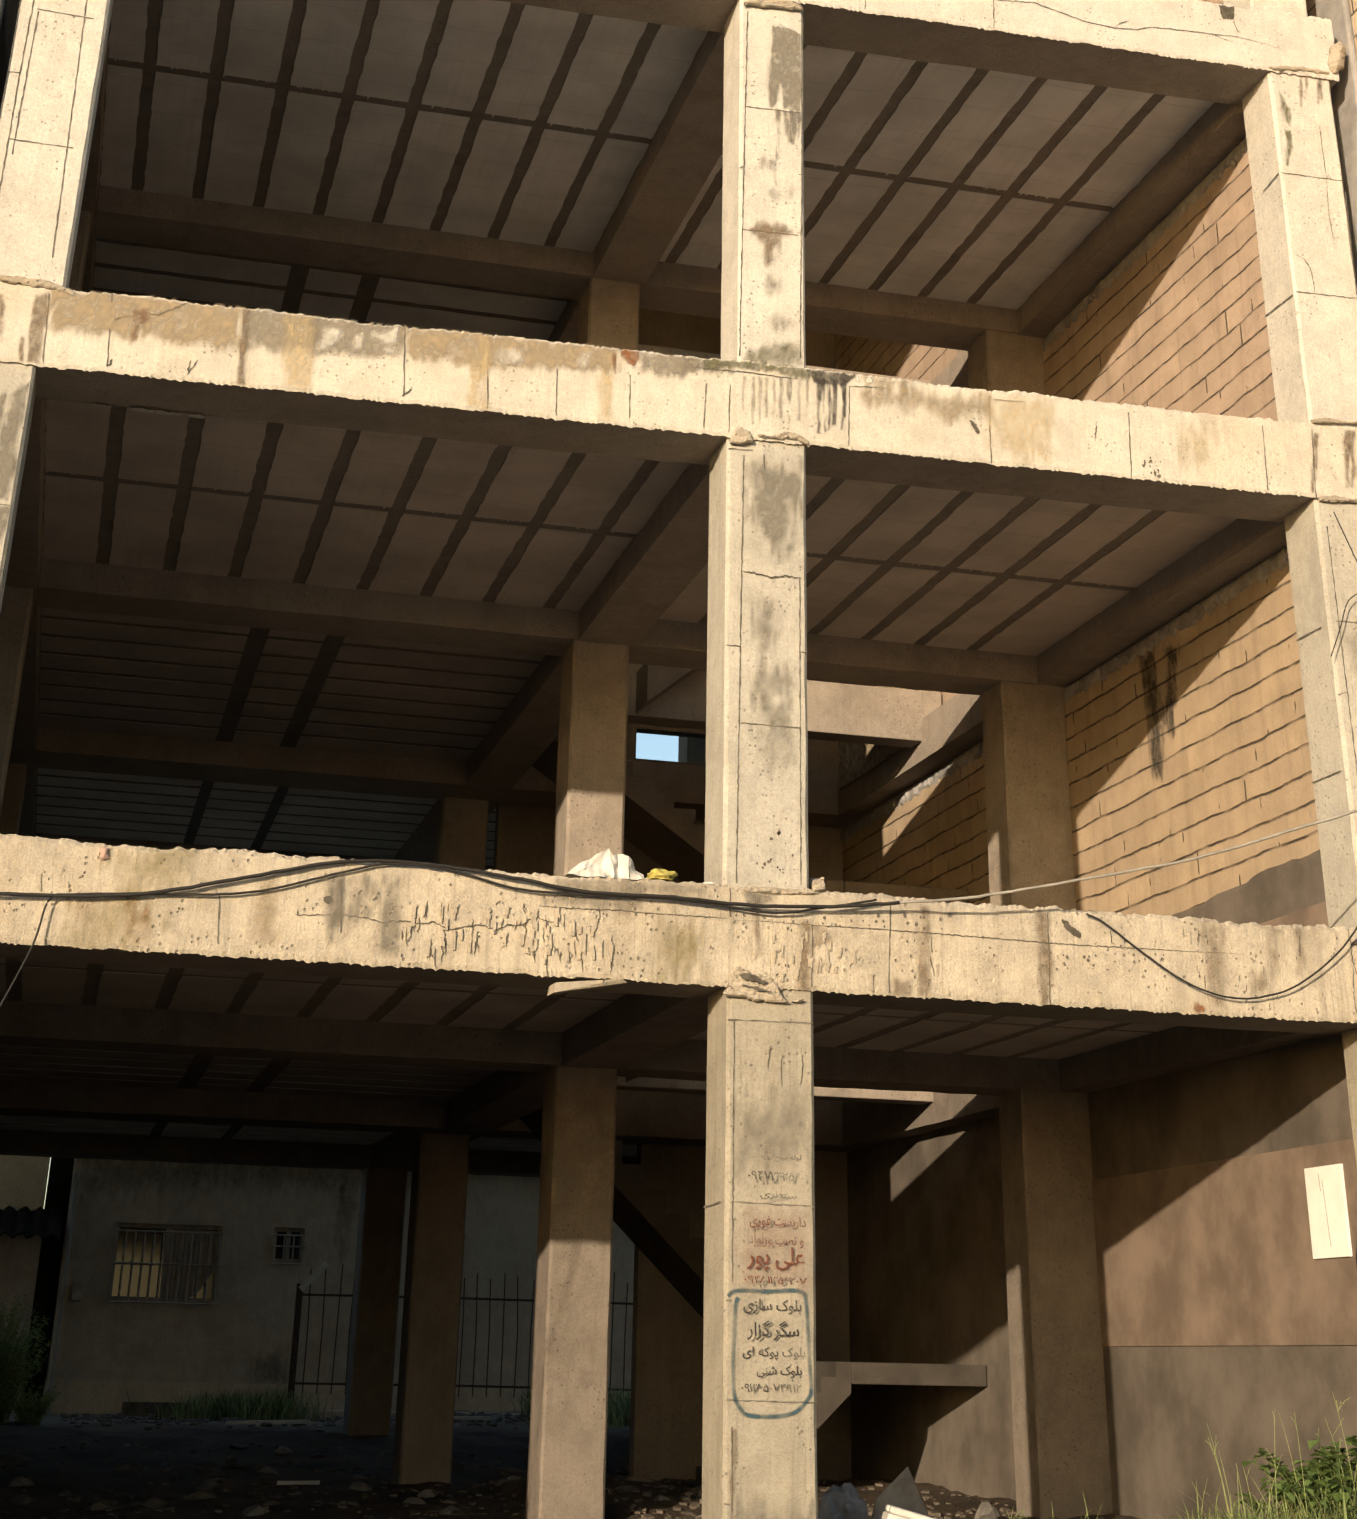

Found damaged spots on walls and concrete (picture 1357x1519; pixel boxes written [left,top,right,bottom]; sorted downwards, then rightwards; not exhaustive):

crack [1005,0,1280,49]
water stain [769,26,801,144]
water stain [19,296,47,361]
water stain [749,345,906,432]
water stain [0,387,26,536]
water stain [1344,431,1355,480]
water stain [755,467,802,544]
crack [295,900,1278,1009]